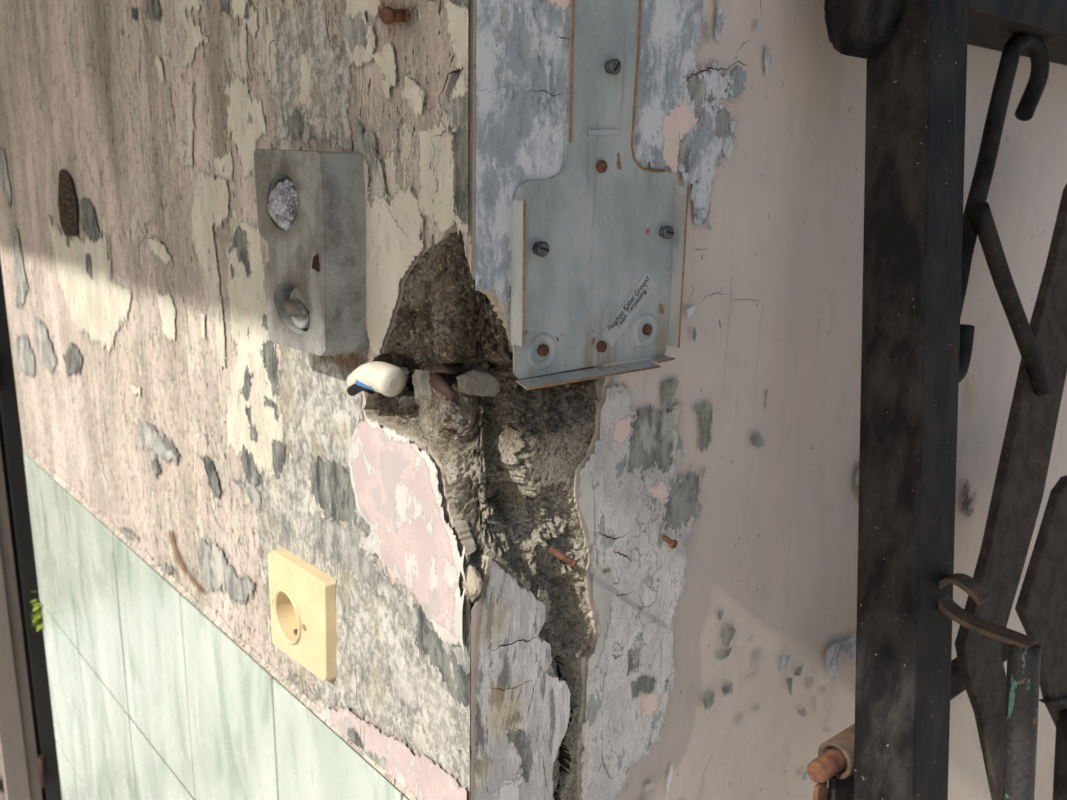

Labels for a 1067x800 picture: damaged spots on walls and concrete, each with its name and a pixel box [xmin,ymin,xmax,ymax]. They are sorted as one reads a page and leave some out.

peeling [131,0,162,22]
peeling [633,0,747,237]
peeling [11,228,28,310]
peeling [16,169,134,378]
peeling [147,233,172,264]
peeling [156,290,176,341]
spalling [175,0,713,800]
peeling [139,422,179,480]
crack [598,532,633,562]
peeling [716,610,736,660]
crack [488,586,635,800]
peeling [703,682,733,709]